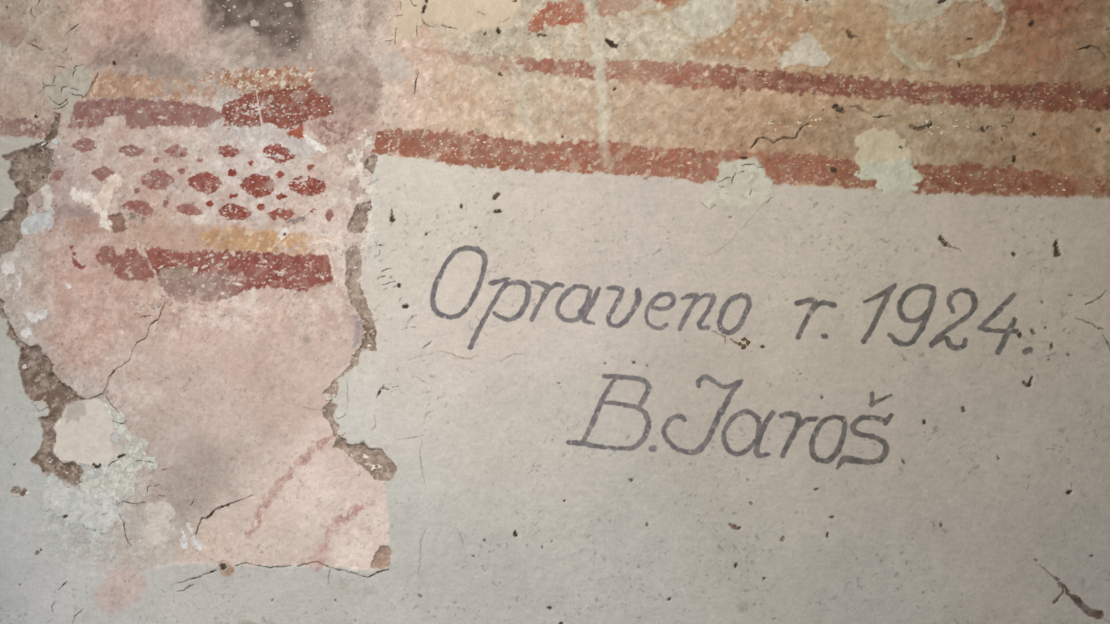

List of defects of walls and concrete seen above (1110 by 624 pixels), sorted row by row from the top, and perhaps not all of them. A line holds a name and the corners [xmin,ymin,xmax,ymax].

peeling [213,65,332,126]
spalling [0,110,70,258]
spalling [108,211,236,317]
spalling [0,297,160,504]
crack [79,303,166,425]
crack [91,459,255,547]
crack [51,581,84,624]
hole [217,559,235,578]
spalling [369,545,393,570]